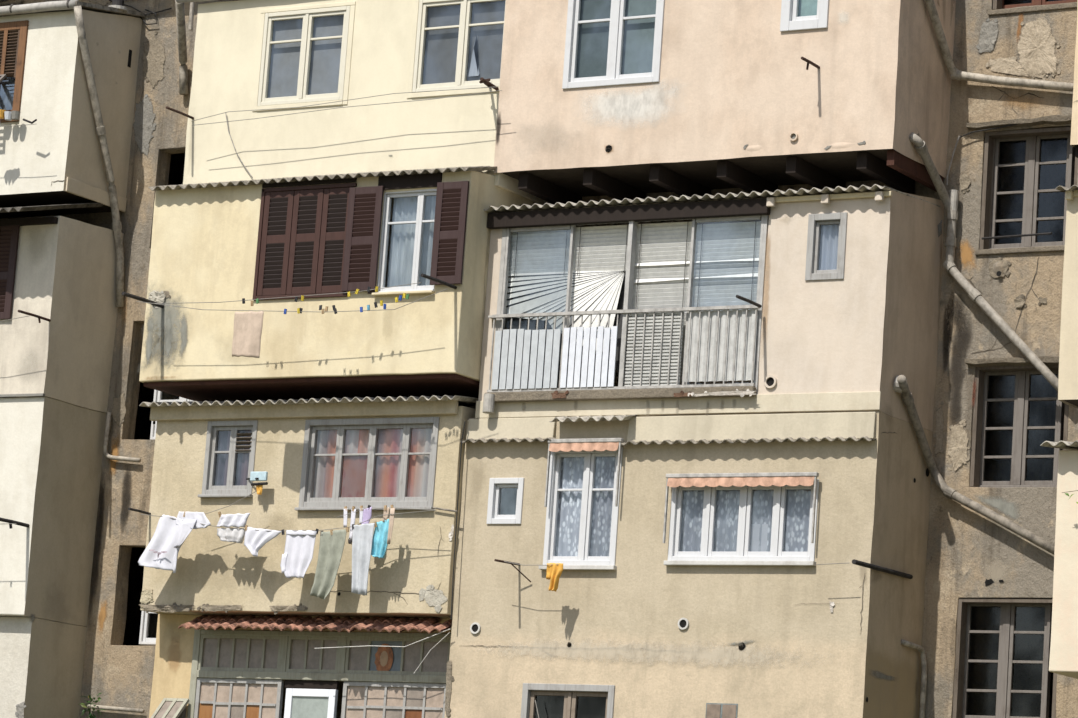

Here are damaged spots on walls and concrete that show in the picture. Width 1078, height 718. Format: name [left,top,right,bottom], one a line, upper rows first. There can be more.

spalling [976,17,1061,81]
leakage [146,298,187,364]
leakage [943,299,970,426]